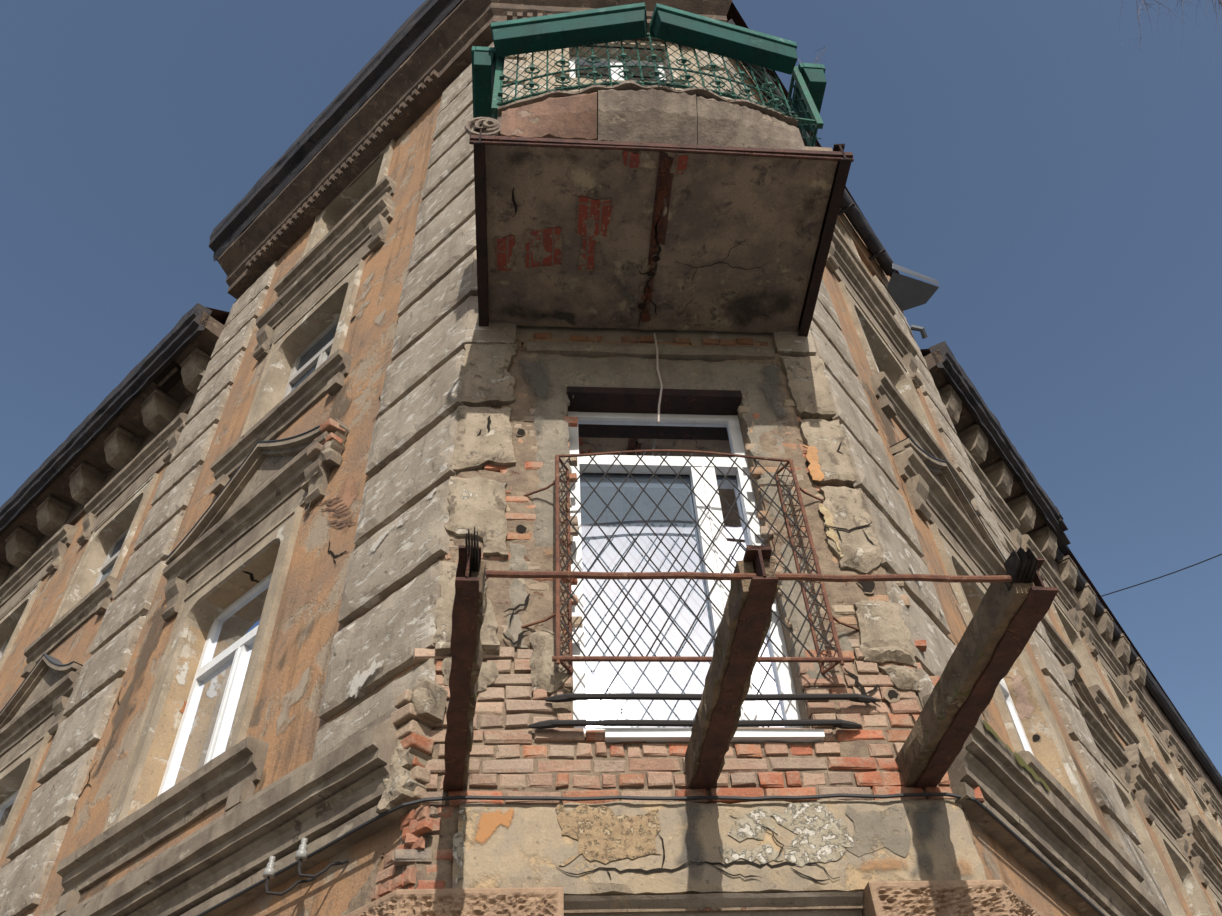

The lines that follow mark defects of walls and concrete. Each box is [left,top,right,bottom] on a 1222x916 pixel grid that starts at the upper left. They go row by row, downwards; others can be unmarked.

crack [638,211,770,327]
crack [503,594,530,646]
spalling [340,333,954,916]
spalling [971,787,985,803]
crack [556,821,840,882]